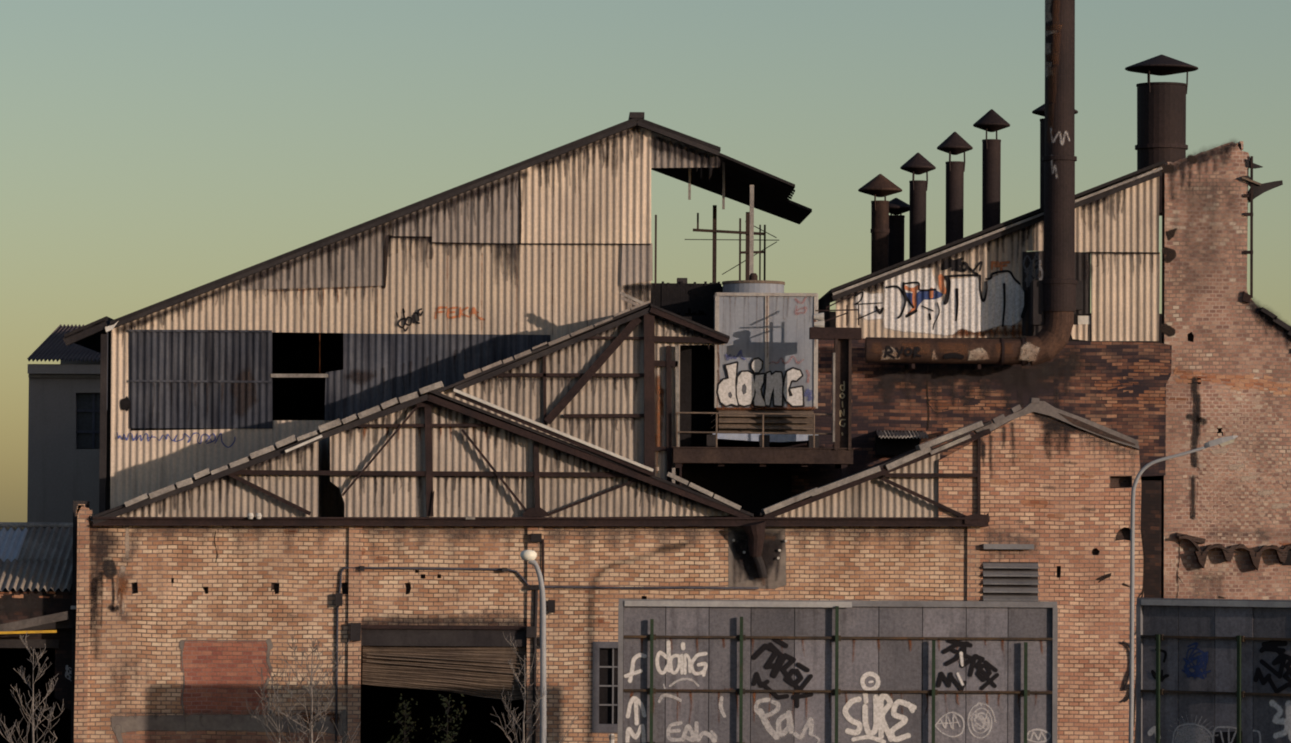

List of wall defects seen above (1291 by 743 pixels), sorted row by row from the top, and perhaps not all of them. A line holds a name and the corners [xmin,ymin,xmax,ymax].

leakage [117,126,719,341]
corrosion [953,325,1022,339]
leakage [981,423,1014,465]
leakage [1044,367,1071,448]
spalling [1091,360,1291,589]